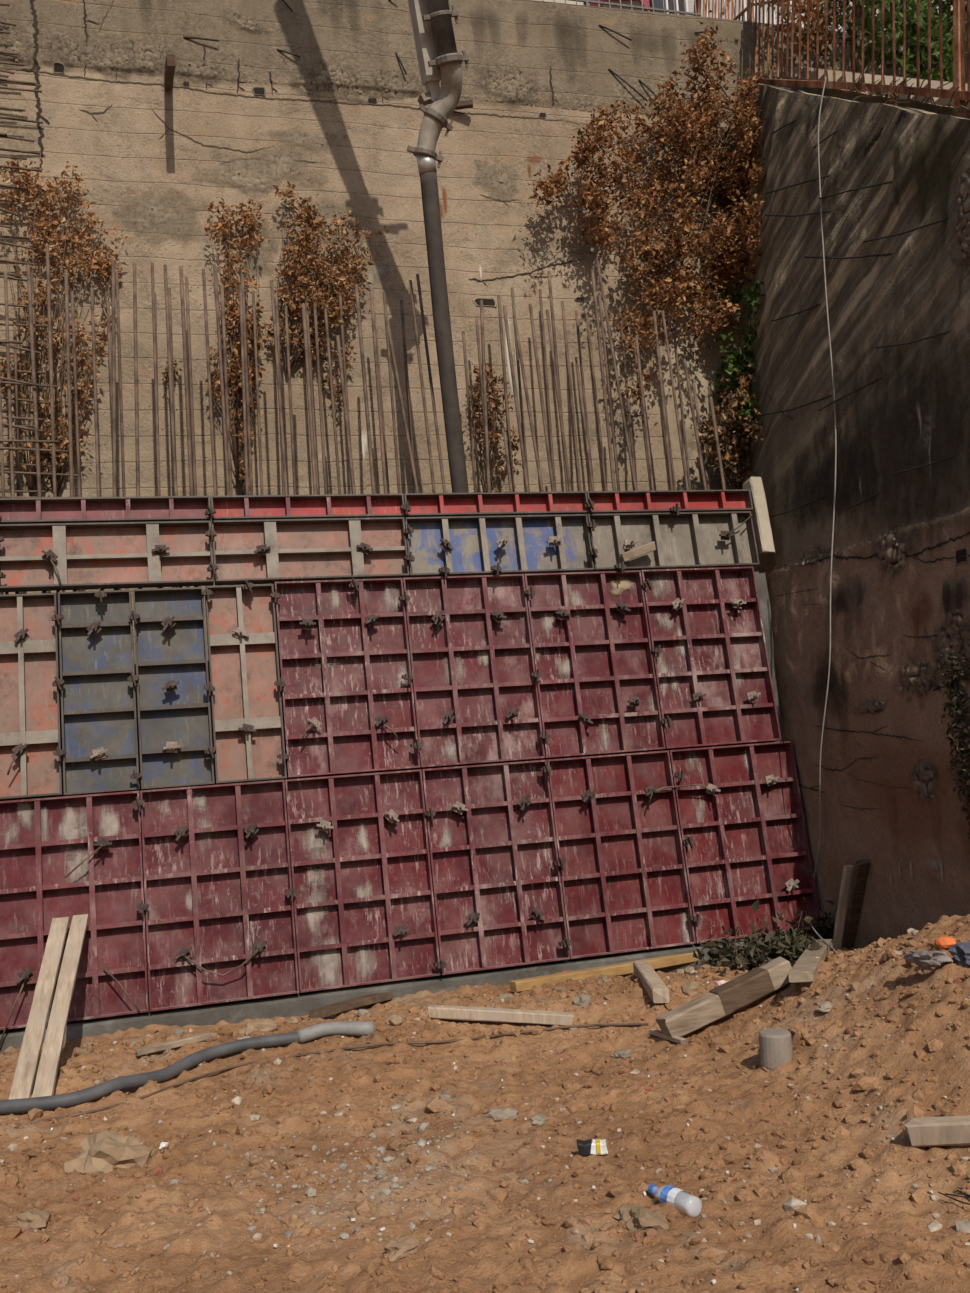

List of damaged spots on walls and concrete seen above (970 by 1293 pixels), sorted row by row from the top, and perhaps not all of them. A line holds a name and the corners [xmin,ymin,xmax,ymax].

spalling [0,3,42,93]
crack [0,0,418,167]
crack [453,66,585,124]
spalling [0,107,43,172]
spalling [297,202,352,244]
spalling [0,222,278,498]
spalling [275,274,446,495]
crack [775,532,970,605]
leakage [817,659,839,702]